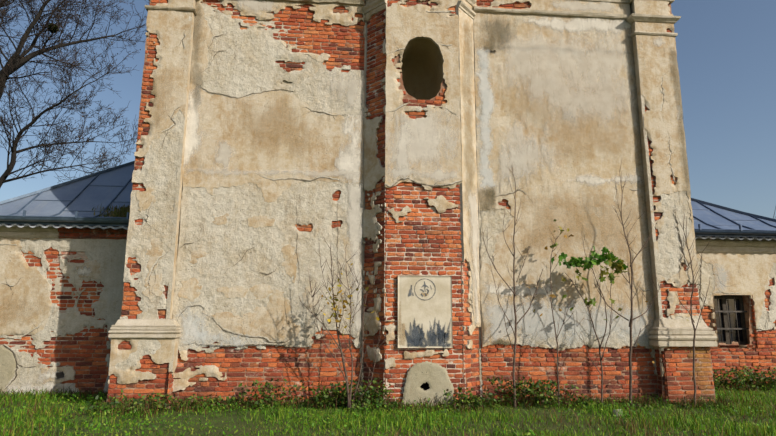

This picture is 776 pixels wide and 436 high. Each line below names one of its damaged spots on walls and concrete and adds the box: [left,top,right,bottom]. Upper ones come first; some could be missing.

spalling [136,31,160,152]
crack [200,24,345,119]
peeling [201,0,447,168]
crack [262,172,341,189]
crack [659,71,740,308]
crack [254,204,300,305]
peeling [0,110,776,408]
crack [176,304,308,353]